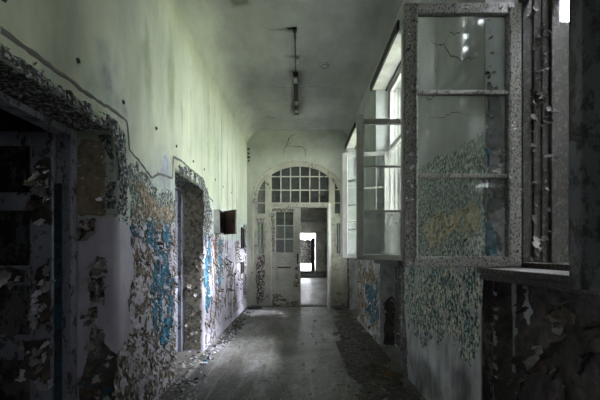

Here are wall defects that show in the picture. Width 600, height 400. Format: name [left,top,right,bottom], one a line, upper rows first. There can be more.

peeling [530,23,558,133]
spalling [0,43,247,400]
peeling [255,208,295,303]
peeling [346,66,551,378]
peeling [529,230,555,262]
peeling [490,281,600,400]